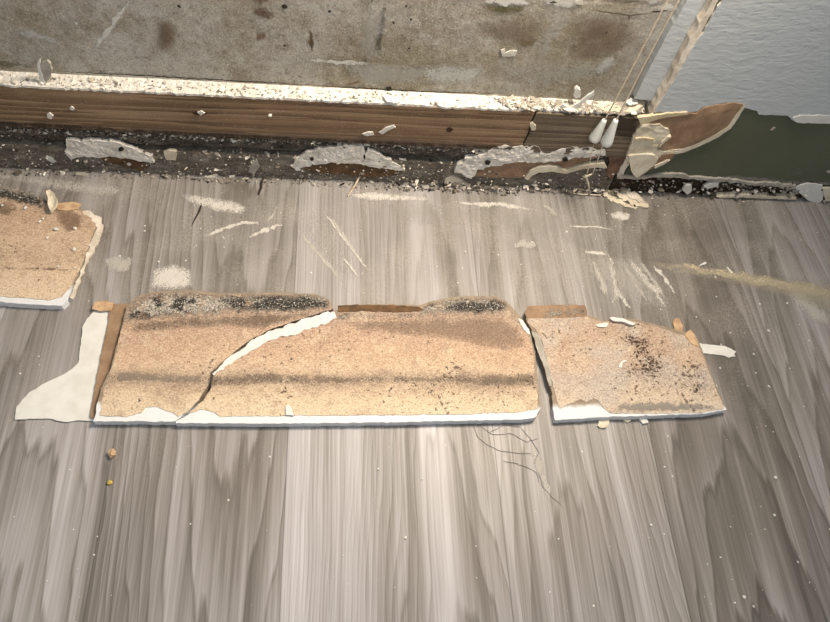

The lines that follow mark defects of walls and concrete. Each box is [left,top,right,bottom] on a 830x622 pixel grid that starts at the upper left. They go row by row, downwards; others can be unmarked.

crack [485,0,536,13]
crack [589,9,652,20]
peeling [793,114,830,124]
flaking render [164,148,177,160]